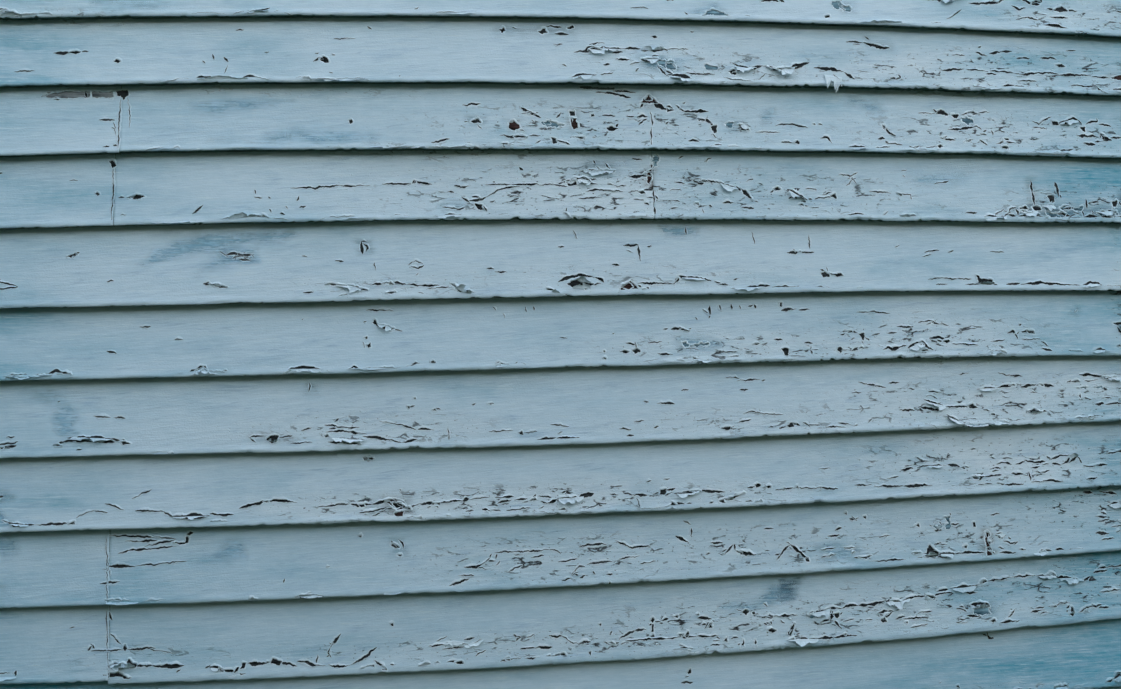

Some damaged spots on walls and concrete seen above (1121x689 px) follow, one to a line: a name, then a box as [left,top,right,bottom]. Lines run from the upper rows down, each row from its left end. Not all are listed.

peeling [926,0,1101,34]
peeling [368,111,655,149]
peeling [438,160,754,219]
peeling [546,271,605,296]
peeling [899,394,1011,427]
peeling [249,418,451,462]
peeling [610,477,785,510]
peeling [970,448,1121,541]
peeling [854,513,985,563]
peeling [676,563,1121,685]
peeling [87,633,184,682]
peeling [205,656,297,679]